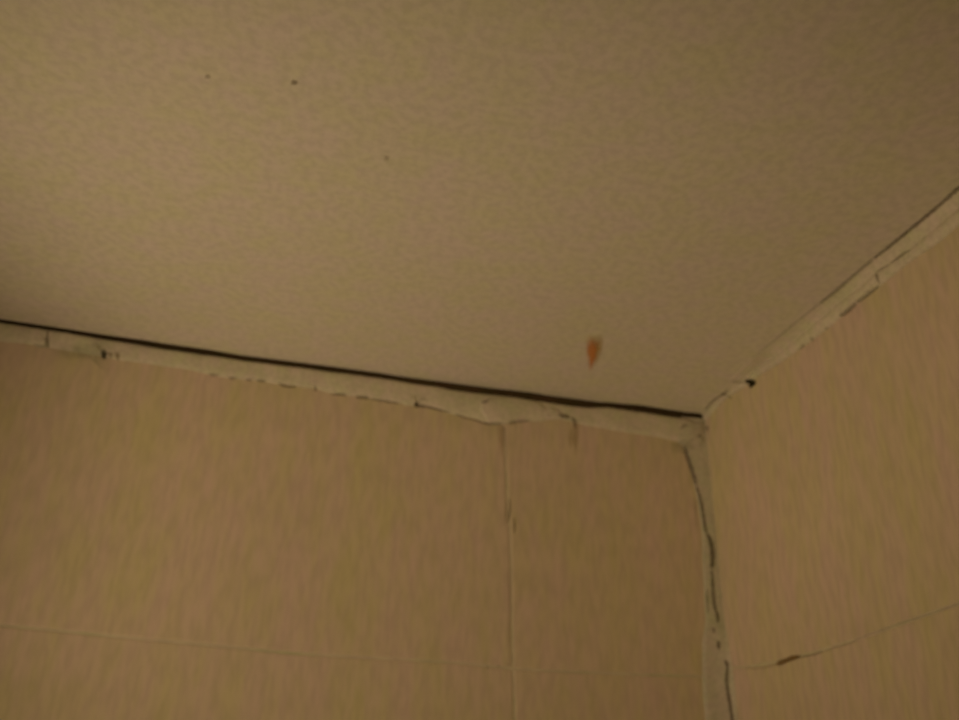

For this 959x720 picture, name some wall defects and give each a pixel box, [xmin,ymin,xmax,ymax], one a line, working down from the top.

crack [0,319,703,419]